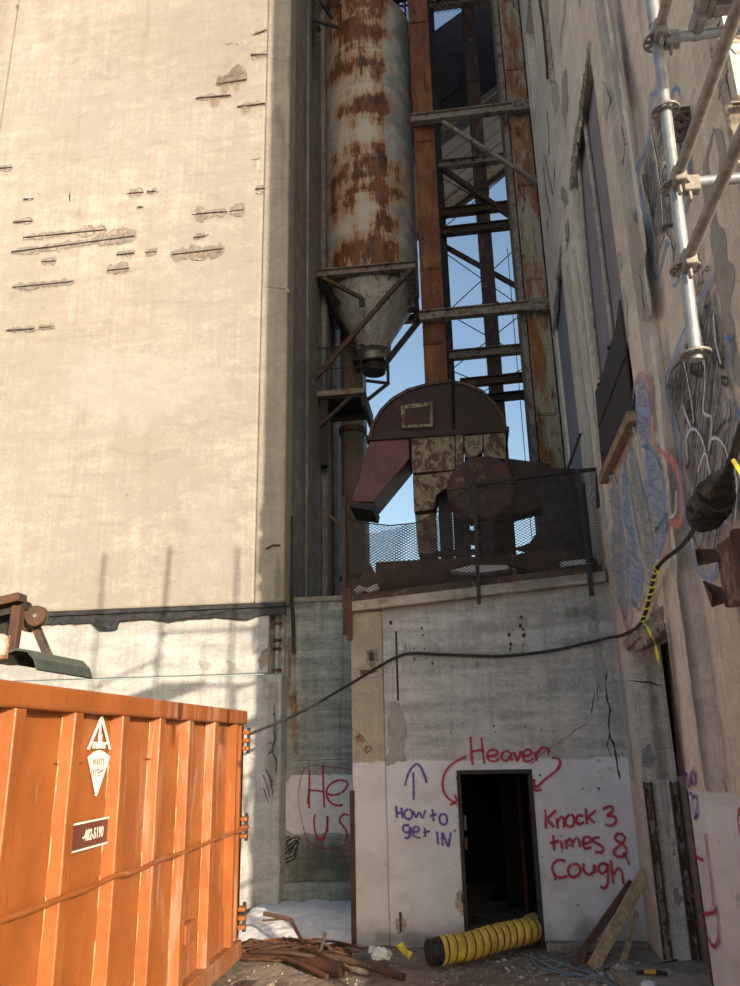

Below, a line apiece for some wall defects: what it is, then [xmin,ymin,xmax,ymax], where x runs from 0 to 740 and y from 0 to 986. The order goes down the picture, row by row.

spalling [195,50,267,108]
spalling [126,187,159,210]
spalling [10,217,157,275]
spalling [170,203,245,262]
spalling [12,278,75,291]
spalling [6,323,56,333]
crack [530,672,662,779]